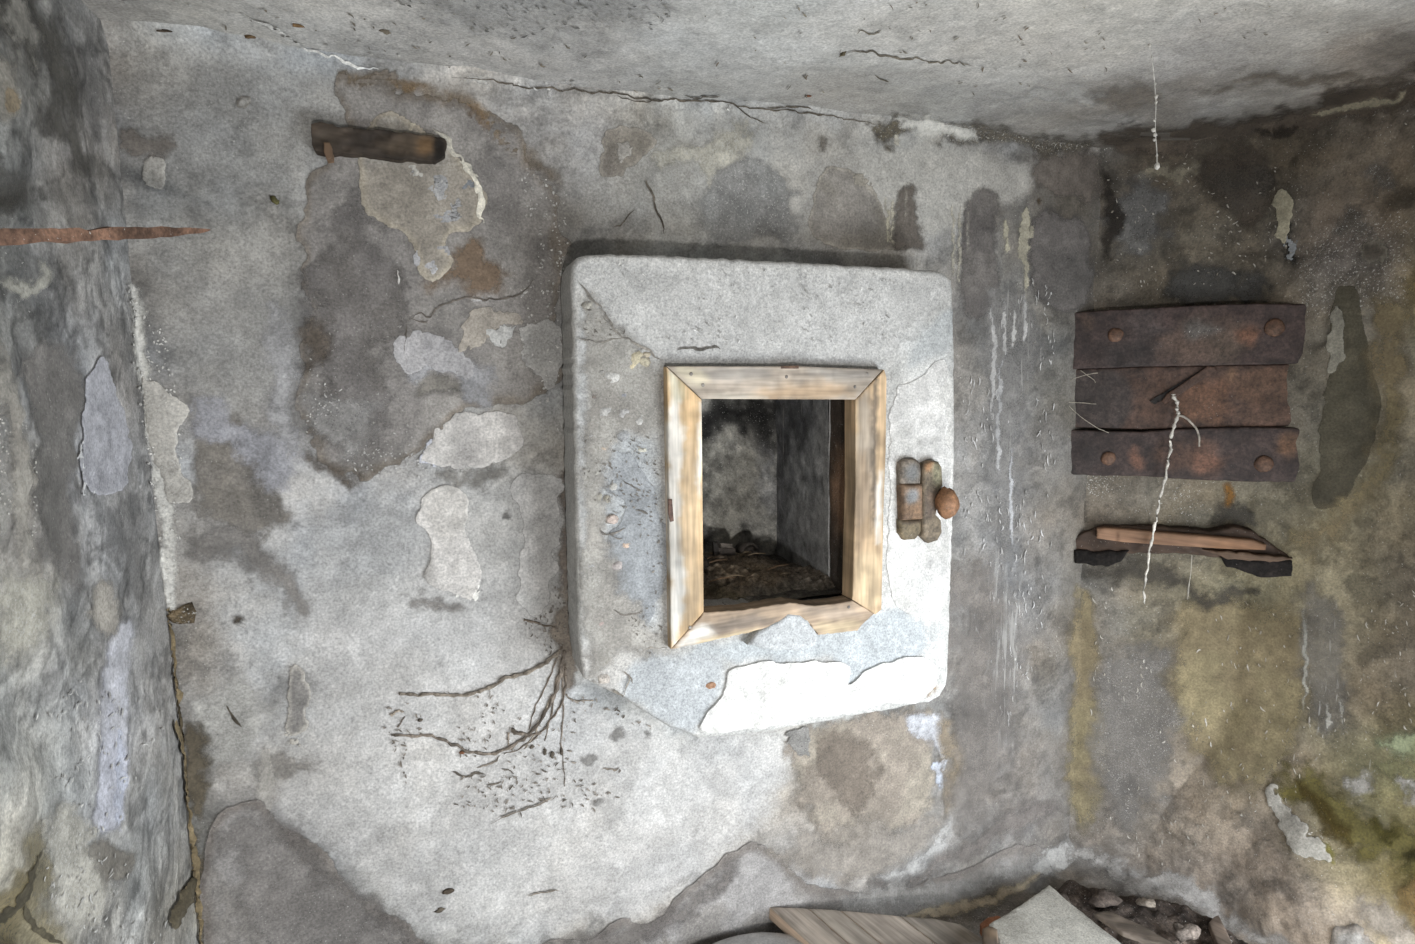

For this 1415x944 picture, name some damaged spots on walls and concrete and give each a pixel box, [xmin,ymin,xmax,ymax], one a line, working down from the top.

crack [839,30,972,82]
spalling [599,125,657,177]
water stain [652,122,798,250]
flaking render [294,69,571,482]
water stain [872,27,1415,560]
spalling [579,293,673,684]
peeling [700,657,937,756]
water stain [1344,773,1370,793]